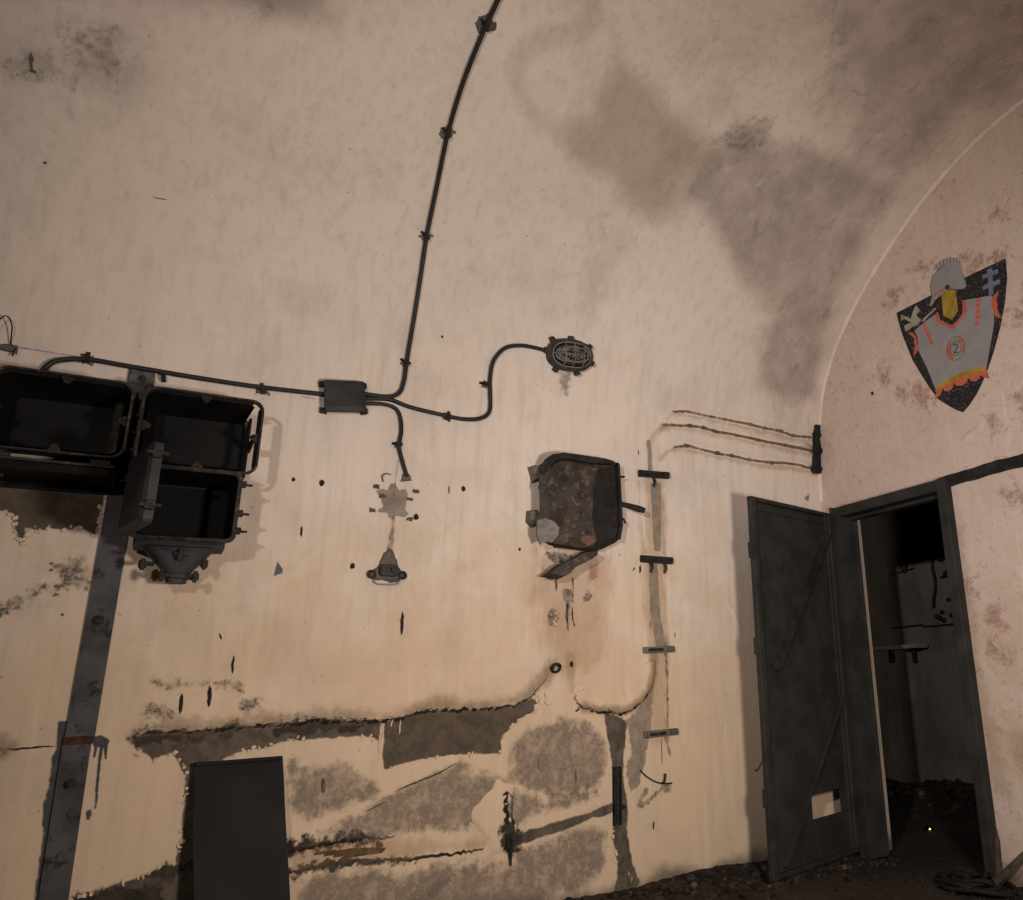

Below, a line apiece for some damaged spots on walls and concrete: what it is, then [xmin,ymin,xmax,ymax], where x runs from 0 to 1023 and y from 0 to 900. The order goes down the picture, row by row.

spalling [0,487,107,546]
spalling [68,693,551,900]
flaking render [301,715,640,900]